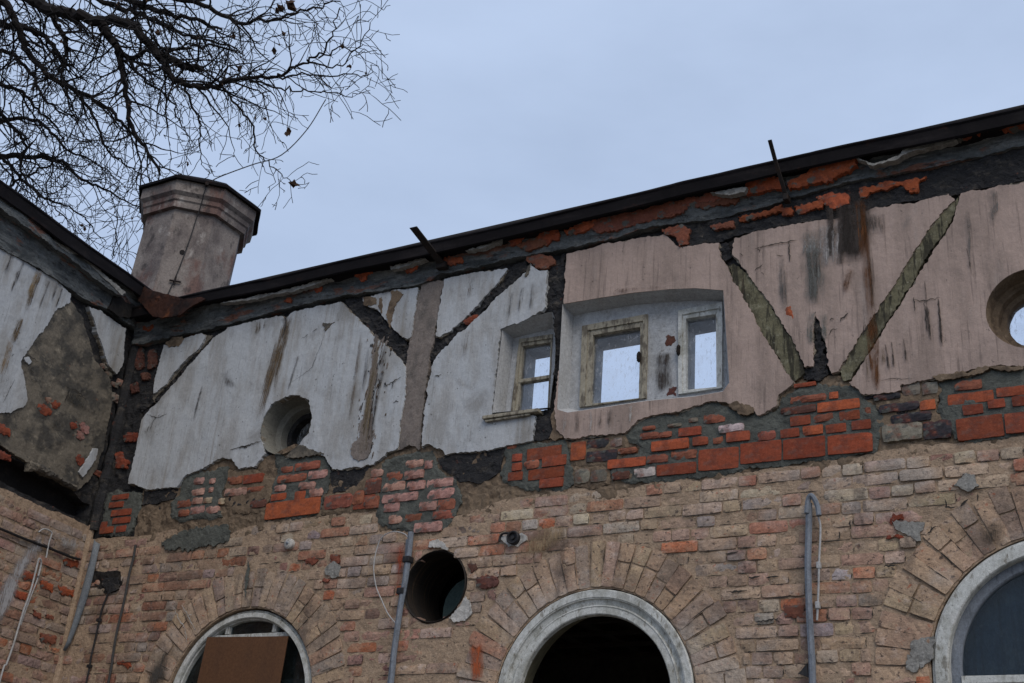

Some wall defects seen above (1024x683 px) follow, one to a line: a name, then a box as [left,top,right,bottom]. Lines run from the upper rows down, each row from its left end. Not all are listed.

spalling [508,158,927,277]
damp [803,225,841,299]
flaking render [0,300,184,489]
flaking render [170,290,463,534]
flaking render [500,365,1024,492]
flaking render [99,490,143,537]